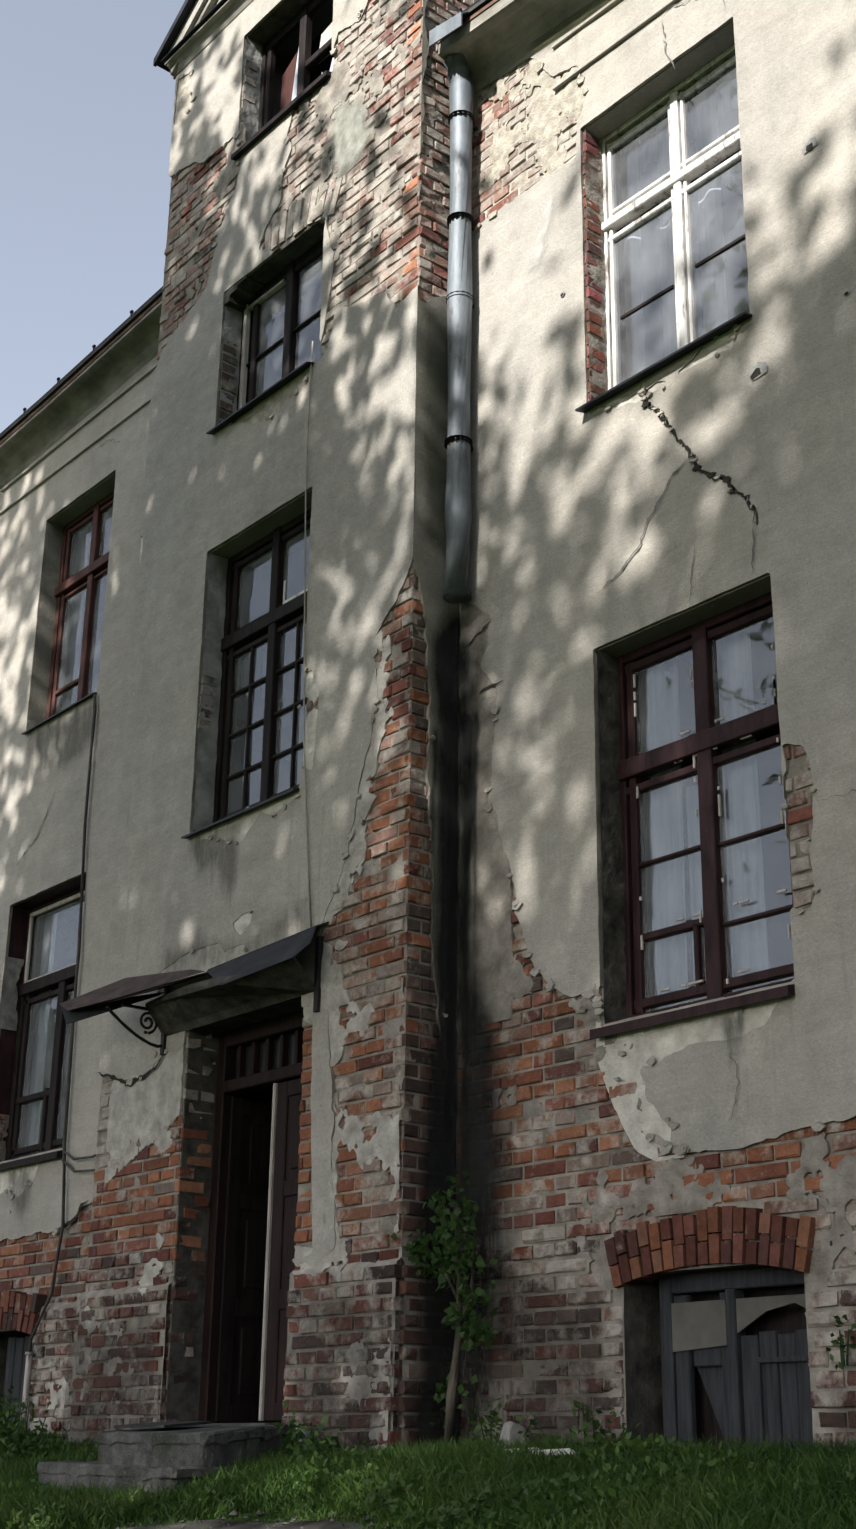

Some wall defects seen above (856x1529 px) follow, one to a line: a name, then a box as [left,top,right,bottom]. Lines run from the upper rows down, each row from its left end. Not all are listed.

spalling [157,59,258,364]
peeling [217,334,309,425]
spalling [259,0,473,356]
spalling [471,59,741,411]
crack [597,382,756,593]
spalling [281,567,448,1452]
water stain [415,614,503,1448]
spalling [459,603,856,1453]
spalling [0,1030,215,1445]